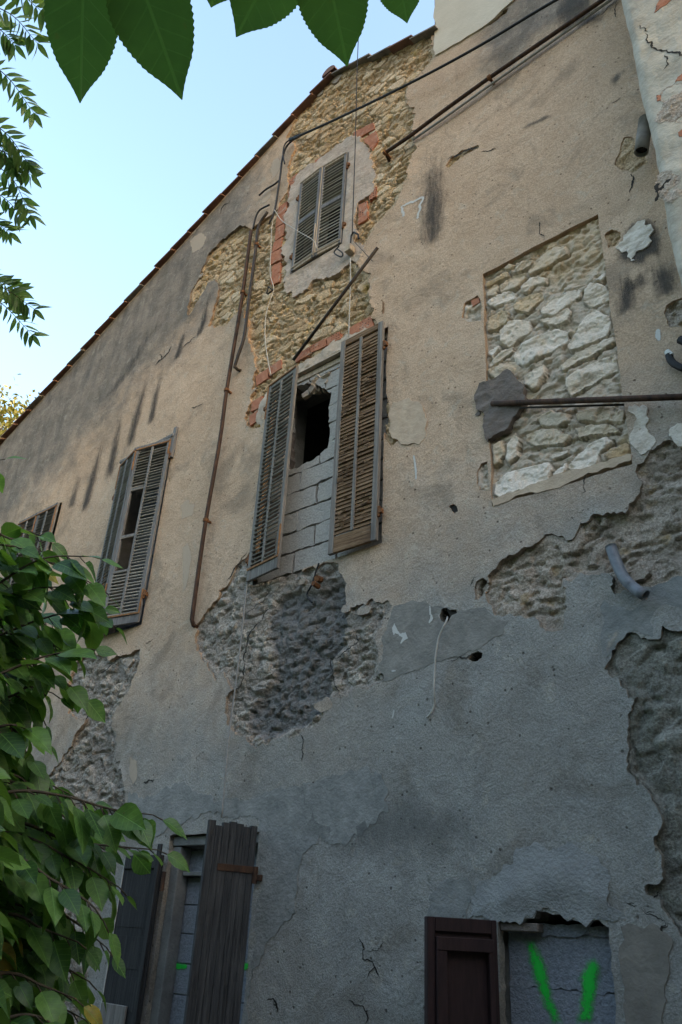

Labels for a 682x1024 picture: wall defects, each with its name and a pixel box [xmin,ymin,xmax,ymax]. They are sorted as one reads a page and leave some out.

crack [639,25,682,69]
spalling [616,138,648,173]
spalling [189,38,435,429]
spalling [606,231,621,248]
spalling [197,441,682,936]
flaking render [49,650,389,1024]
crack [349,939,383,1022]